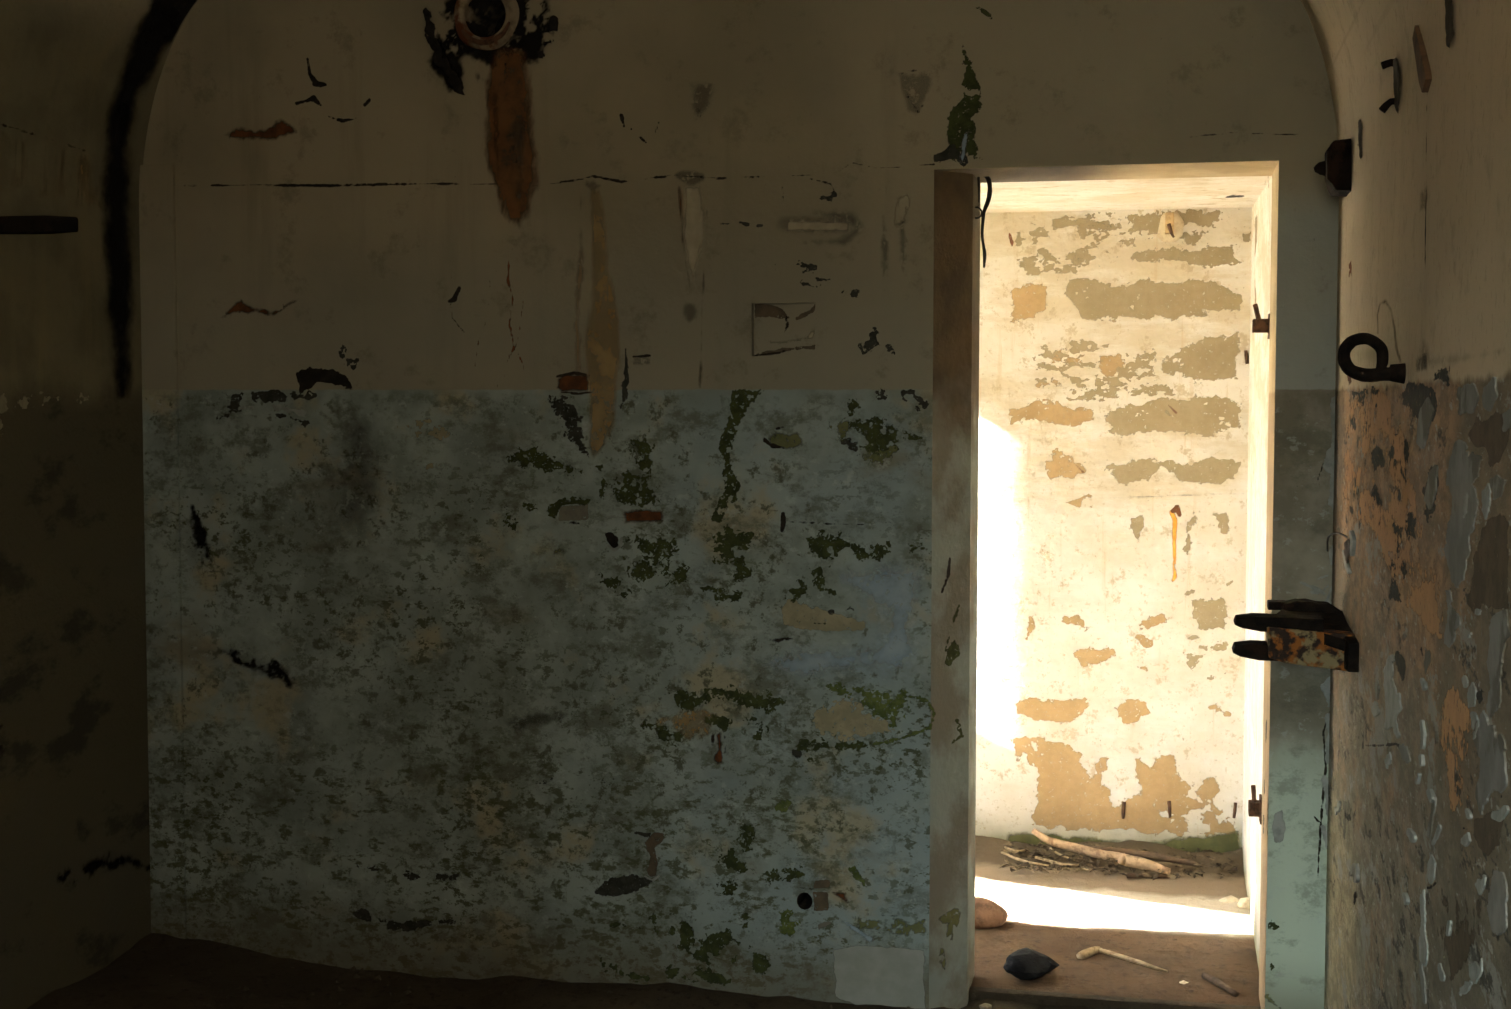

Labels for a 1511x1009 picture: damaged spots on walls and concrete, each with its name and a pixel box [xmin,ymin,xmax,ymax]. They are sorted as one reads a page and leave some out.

corrosion [477,50,538,223]
spalling [1010,209,1257,323]
spalling [1009,331,1258,438]
spalling [1045,448,1086,480]
spalling [1104,456,1241,486]
corrosion [1170,505,1182,581]
spalling [1182,512,1229,554]
spalling [1061,615,1116,667]
spalling [1135,613,1167,648]
spalling [1183,580,1233,680]
flaking render [1342,390,1511,1004]
spalling [1010,698,1235,837]